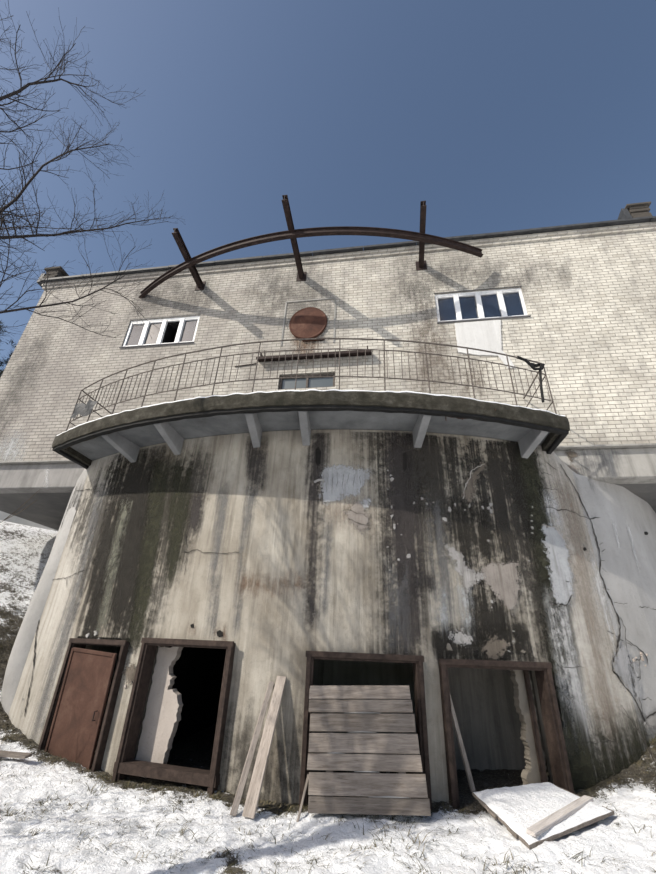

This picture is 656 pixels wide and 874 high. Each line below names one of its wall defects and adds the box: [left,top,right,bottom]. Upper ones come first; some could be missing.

leakage [34,447,211,734]
leakage [211,494,227,604]
leakage [240,441,267,550]
leakage [305,433,330,627]
peeling [315,447,373,534]
leakage [356,431,522,655]
spalling [431,544,538,665]
peeling [530,506,574,608]
crack [530,455,656,725]